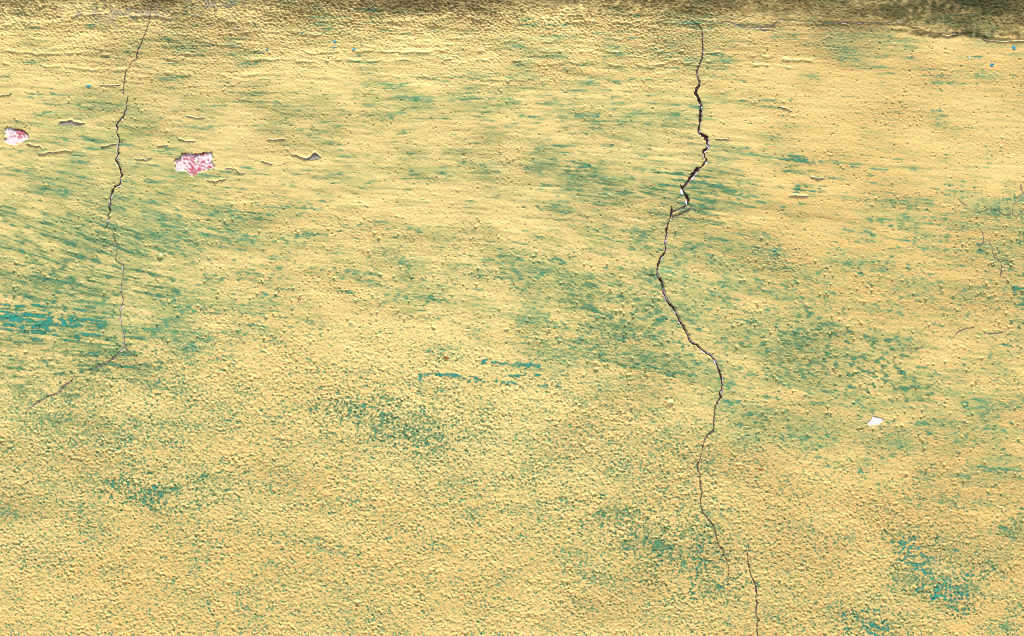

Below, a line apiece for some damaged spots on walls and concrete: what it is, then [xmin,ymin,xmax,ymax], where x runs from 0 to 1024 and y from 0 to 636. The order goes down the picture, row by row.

peeling [4,127,74,154]
crack [26,4,152,412]
peeling [134,137,245,182]
crack [647,19,904,636]